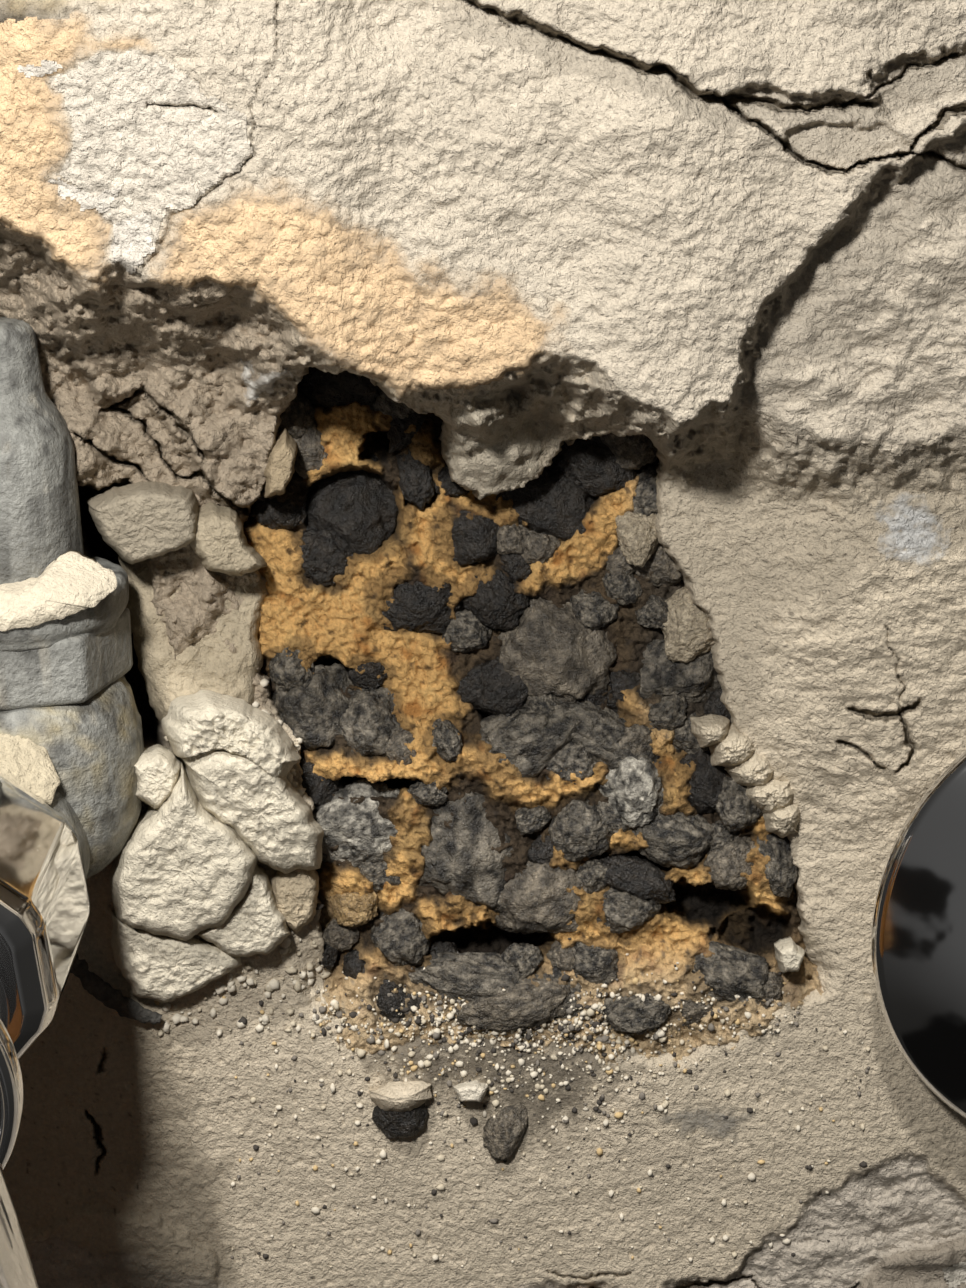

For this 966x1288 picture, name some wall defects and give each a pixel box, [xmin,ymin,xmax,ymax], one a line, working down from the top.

crack [247,0,278,125]
crack [466,0,966,175]
spalling [0,49,824,1068]
crack [837,674,920,768]
crack [676,1276,759,1288]